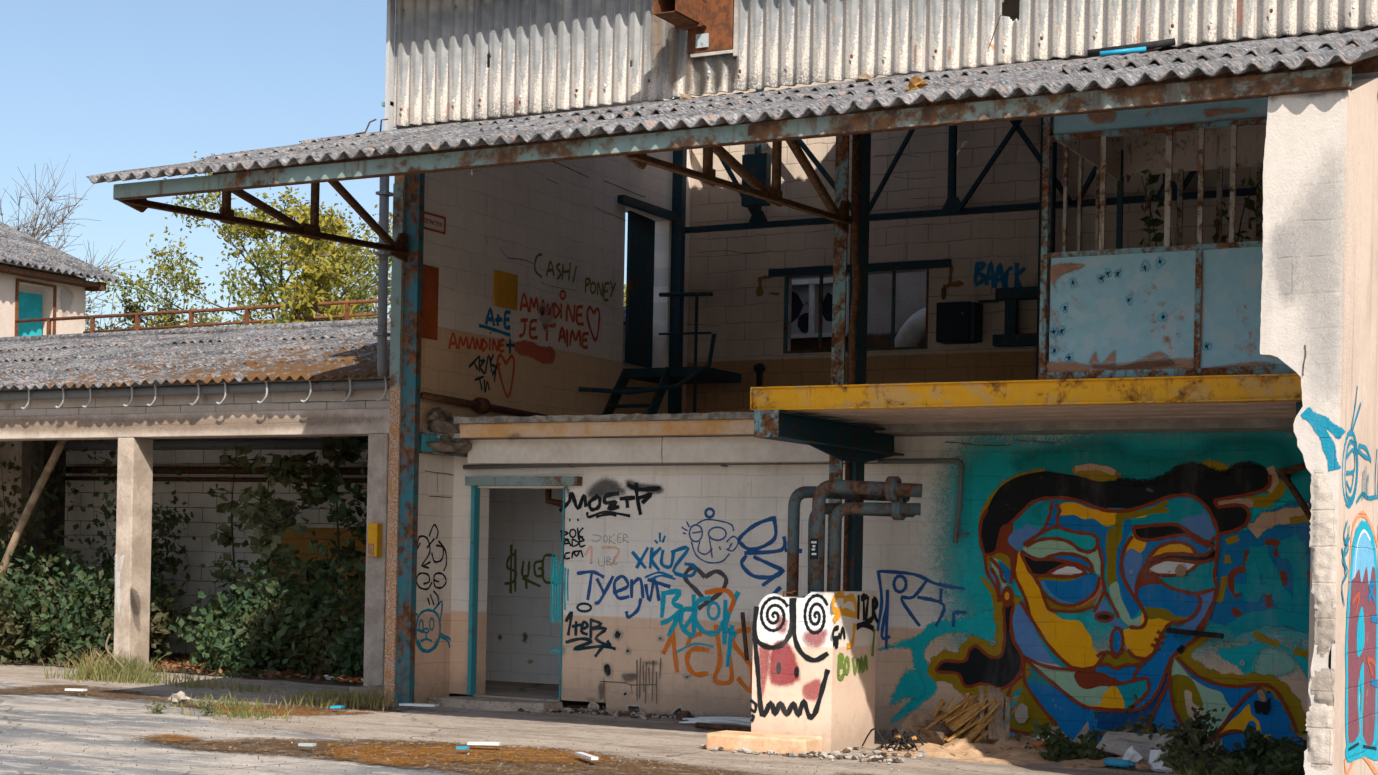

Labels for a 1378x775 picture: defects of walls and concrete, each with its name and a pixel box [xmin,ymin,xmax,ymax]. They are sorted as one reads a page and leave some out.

corrosion [652,14,677,88]
corrosion [1088,111,1115,124]
water stain [1275,179,1333,331]
corrosion [1046,259,1276,372]
spalling [1305,469,1337,771]